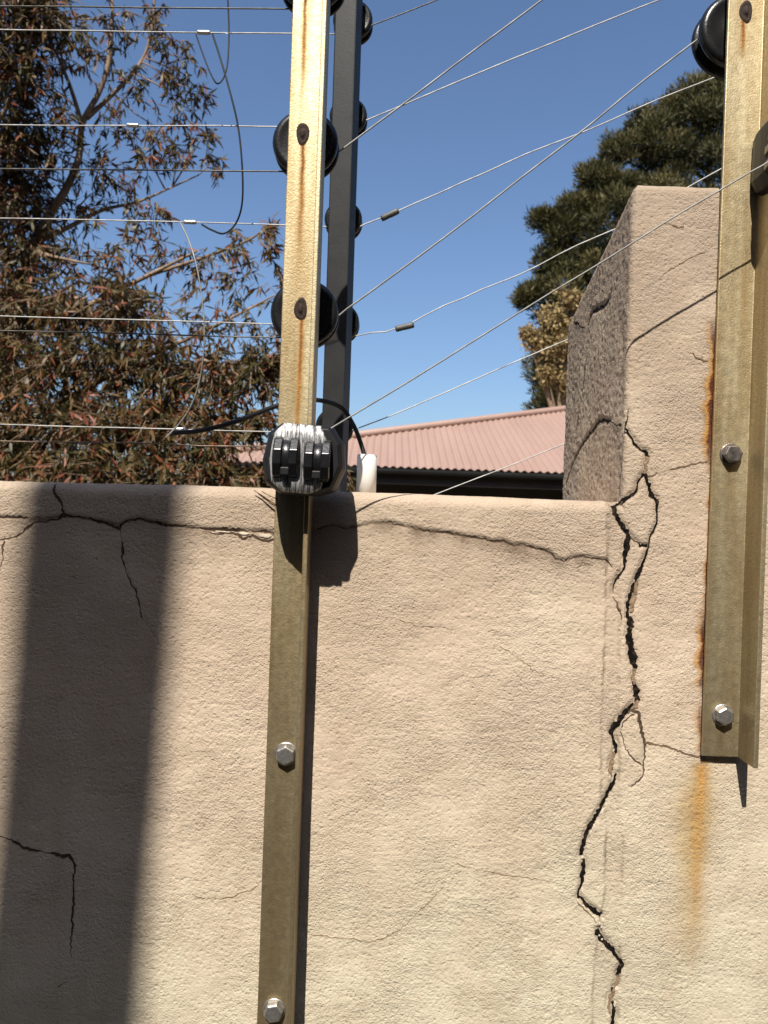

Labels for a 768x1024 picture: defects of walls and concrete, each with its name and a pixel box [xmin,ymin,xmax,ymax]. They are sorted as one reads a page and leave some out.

crack [0,484,274,645]
crack [309,348,709,1024]
crack [0,836,76,957]
corrosion [693,765,706,871]